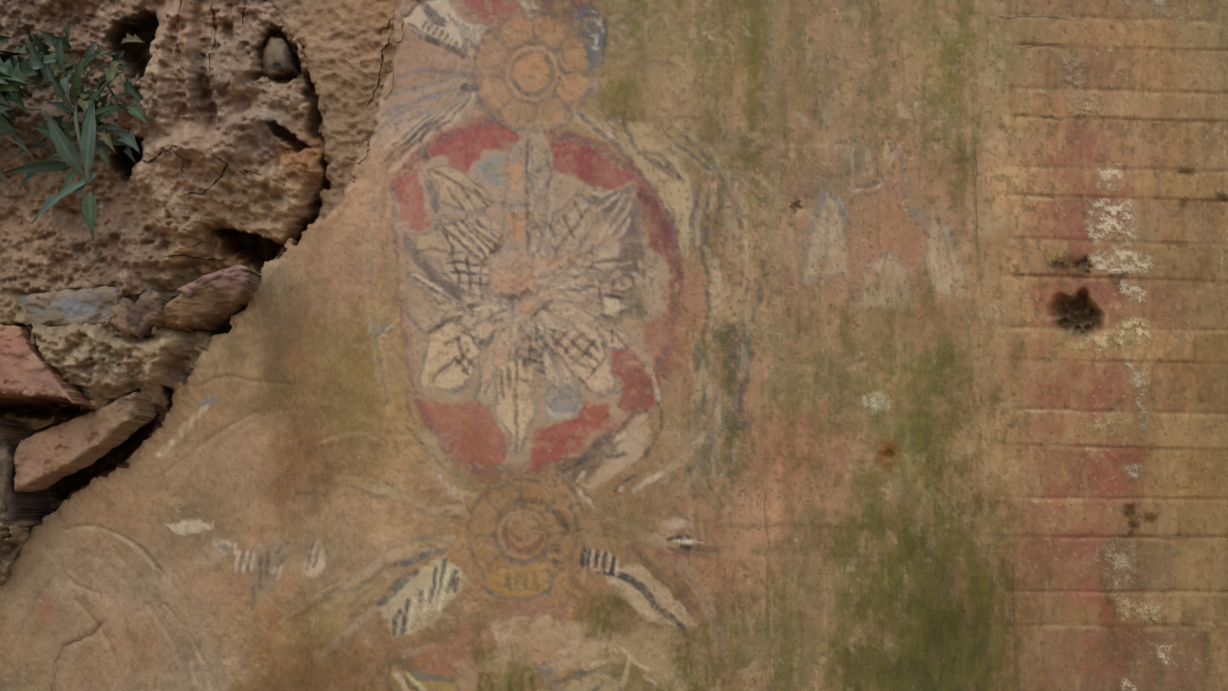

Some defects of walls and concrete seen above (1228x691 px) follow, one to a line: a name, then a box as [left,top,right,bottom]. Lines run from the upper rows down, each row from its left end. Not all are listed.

water stain [1086,164,1153,302]
water stain [1064,317,1152,436]
water stain [828,494,1009,691]
efflorescence [1103,539,1173,623]